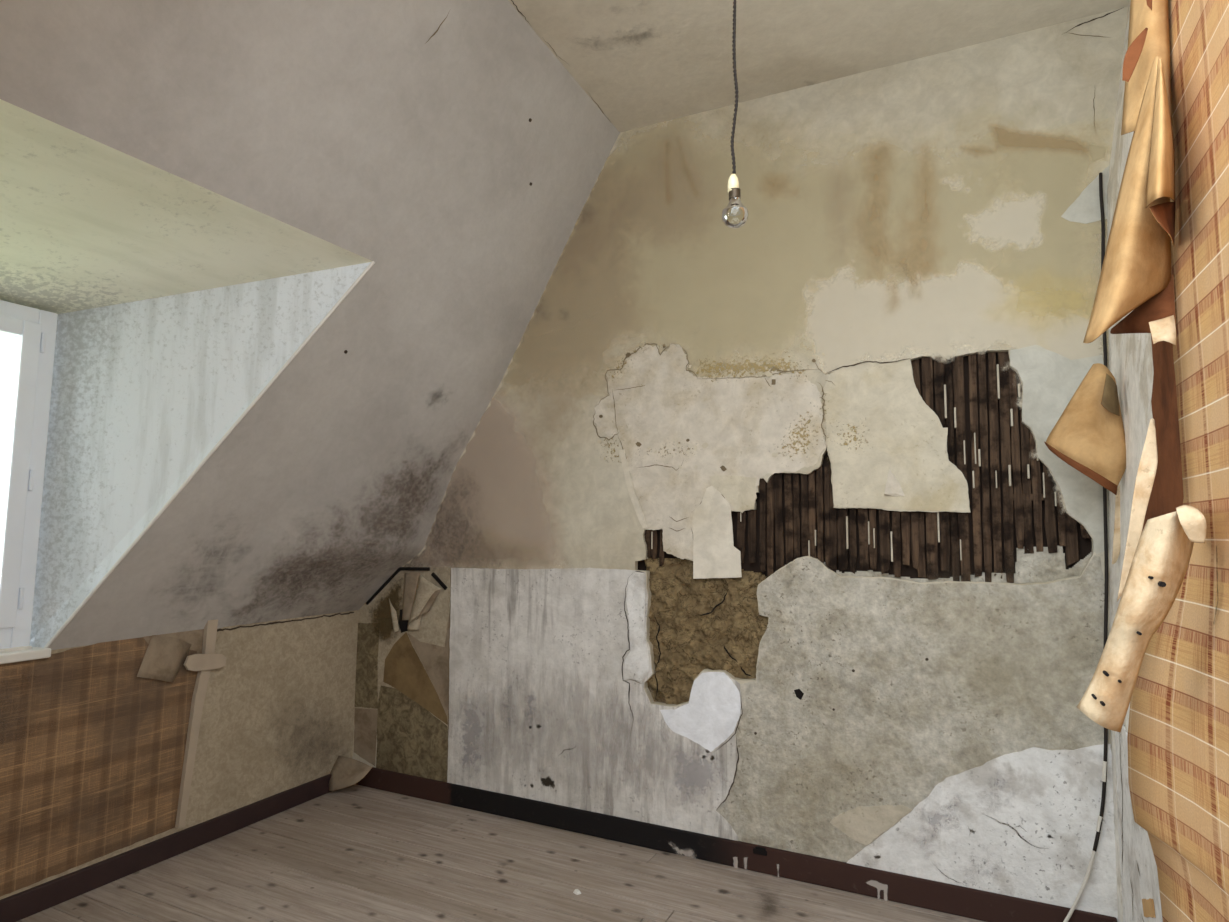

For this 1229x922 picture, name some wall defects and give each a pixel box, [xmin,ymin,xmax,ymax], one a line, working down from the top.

water stain [508,120,1105,382]
peeling [1061,165,1110,224]
water stain [412,399,550,564]
peeling [144,629,204,654]
flaking render [447,263,1163,922]